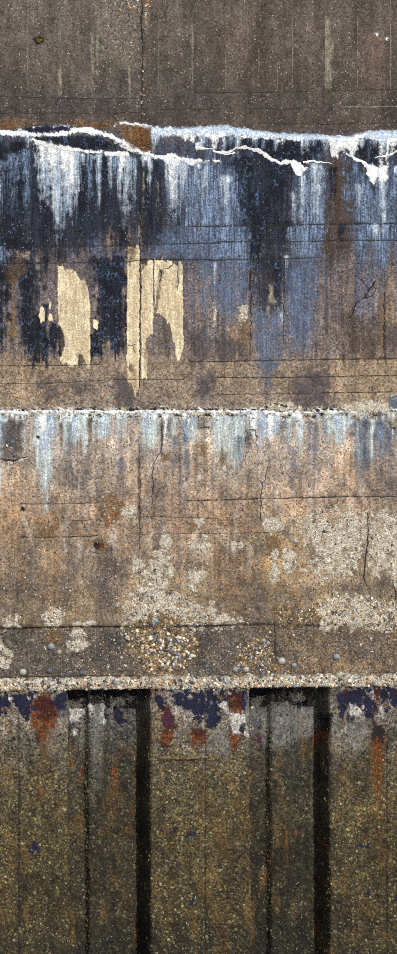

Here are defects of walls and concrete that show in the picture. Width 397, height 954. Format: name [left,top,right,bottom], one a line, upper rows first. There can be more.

crack [139,0,147,124]
rust [123,126,151,152]
water stain [0,121,397,380]
spalling [0,245,397,465]
water stain [188,329,247,398]
water stain [32,412,109,506]
water stain [141,410,197,449]
water stain [212,370,390,470]
rust [29,692,61,748]
rust [160,706,176,748]
rust [227,689,243,751]
rust [370,725,385,811]